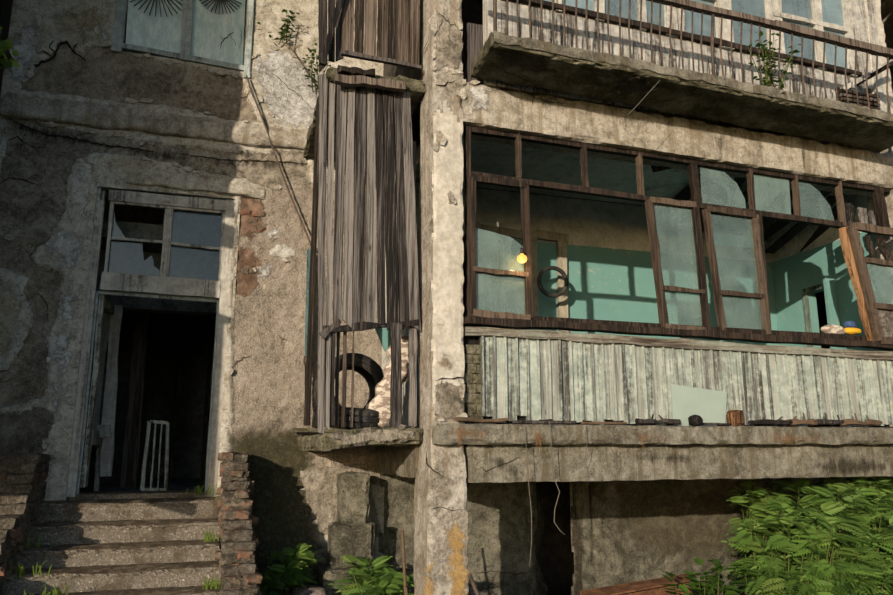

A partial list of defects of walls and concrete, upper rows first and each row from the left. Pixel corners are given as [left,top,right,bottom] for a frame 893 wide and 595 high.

crack [28,12,87,70]
peeling [9,18,319,129]
spalling [428,10,488,109]
peeling [432,131,447,152]
peeling [0,118,415,540]
spalling [434,382,468,422]
damp [230,419,326,595]
rust [447,524,468,595]